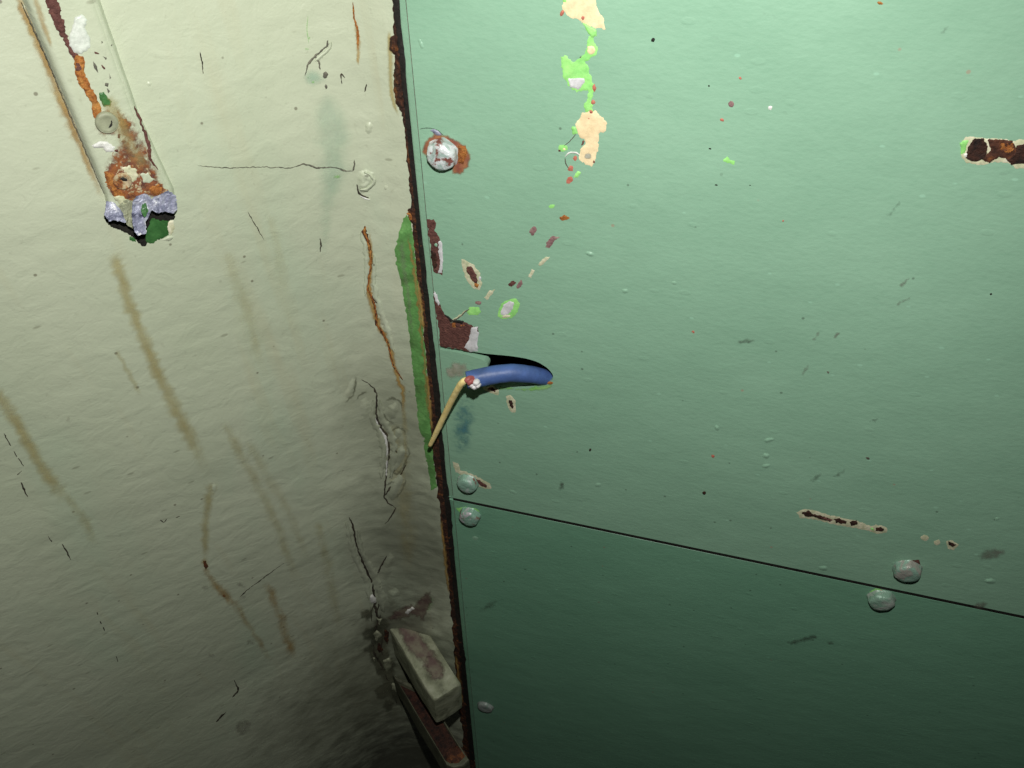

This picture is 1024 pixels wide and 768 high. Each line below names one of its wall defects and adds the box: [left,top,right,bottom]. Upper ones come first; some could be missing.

rust [18,0,168,201]
peeling [558,0,607,184]
crack [203,160,355,177]
peeling [104,210,175,246]
peeling [427,219,443,275]
peeling [498,236,559,319]
crack [354,226,406,524]
peeling [394,215,437,490]
rust [388,0,492,768]
crack [345,517,387,621]
rust [796,509,887,534]